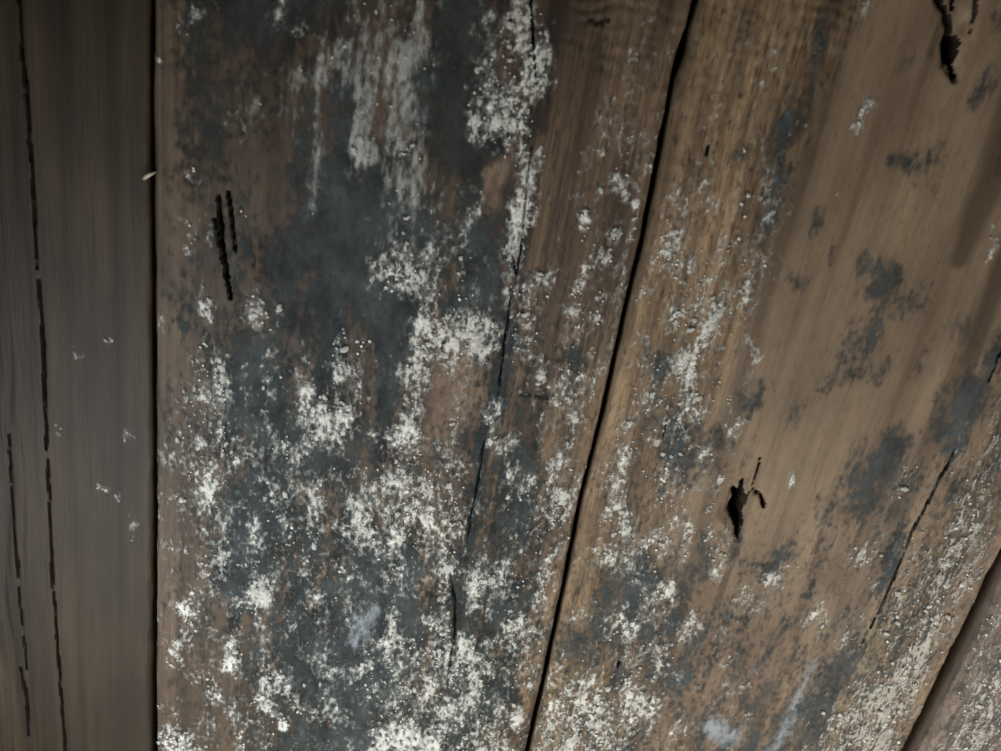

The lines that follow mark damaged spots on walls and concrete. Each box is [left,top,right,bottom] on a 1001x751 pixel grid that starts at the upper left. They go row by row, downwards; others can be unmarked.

crack [528,0,538,86]
crack [500,146,534,366]
damp [564,167,640,329]
damp [651,216,717,296]
crack [16,0,67,751]
damp [166,0,604,751]
damp [632,273,763,503]
crack [7,433,30,736]
damp [156,707,207,751]
crack [450,596,458,668]
damp [524,412,1001,751]
crack [861,456,954,643]